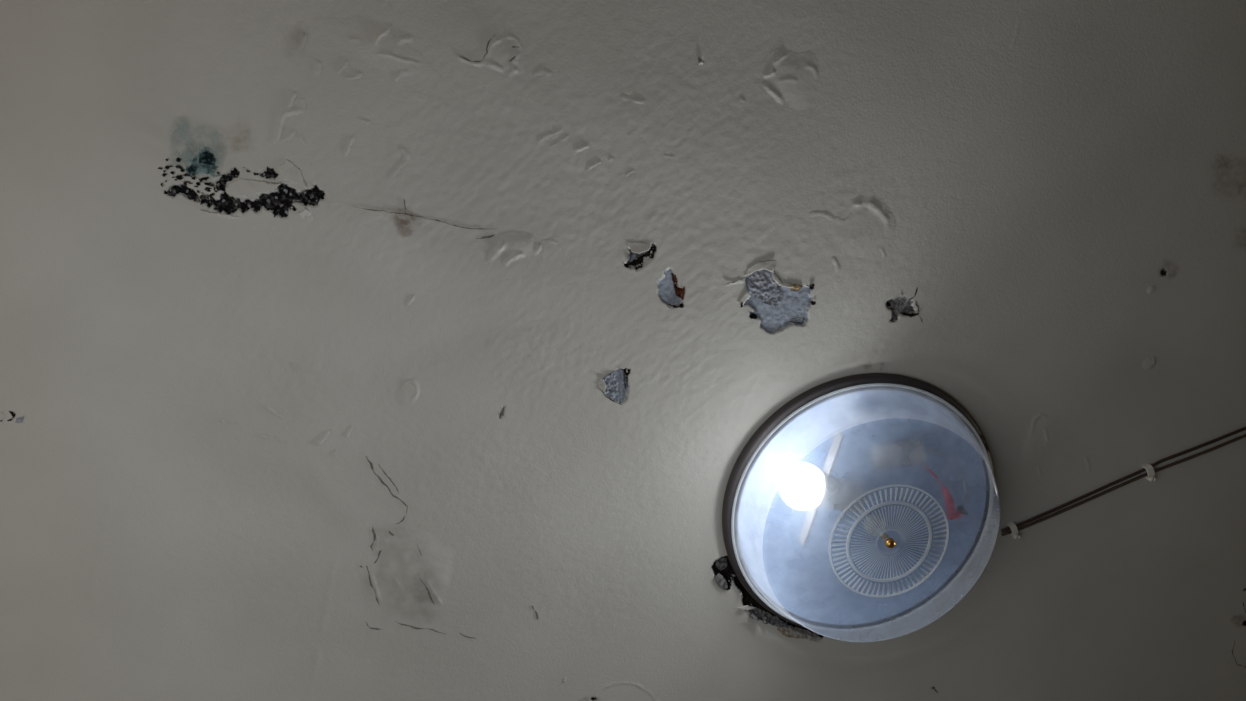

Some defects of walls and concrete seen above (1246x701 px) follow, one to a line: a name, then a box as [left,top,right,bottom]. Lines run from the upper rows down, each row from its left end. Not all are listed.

water stain [158,123,326,219]
spalling [625,241,656,270]
spalling [658,269,685,308]
spalling [726,259,816,333]
spalling [886,288,922,322]
spalling [599,369,630,405]
spalling [712,556,827,642]